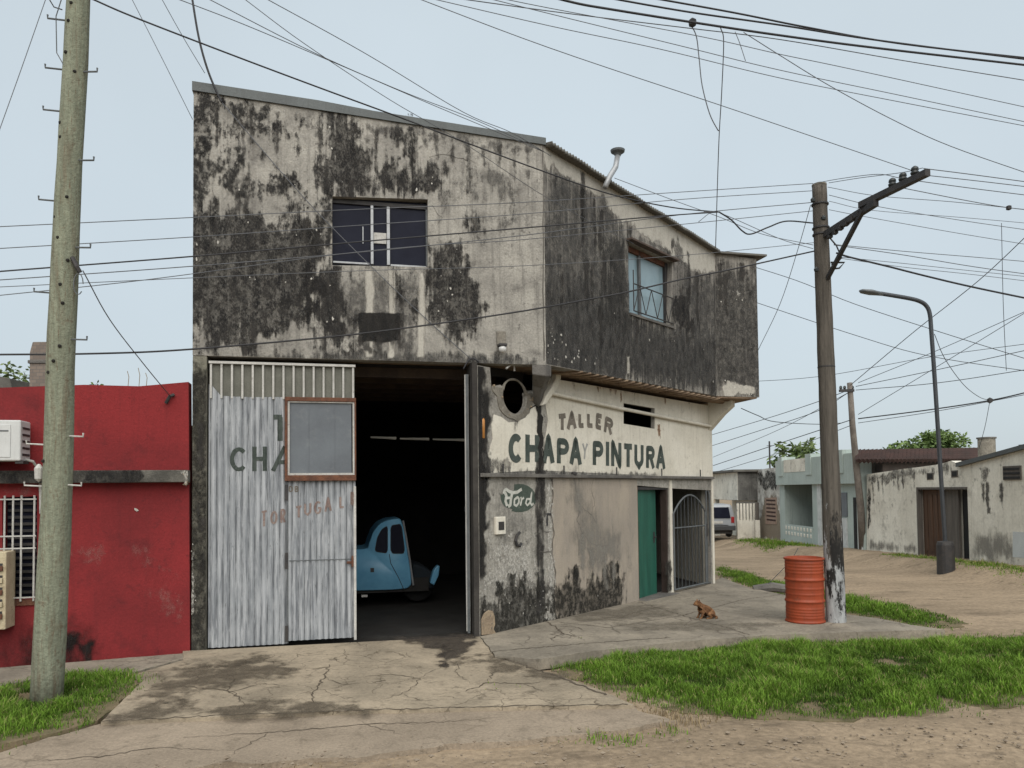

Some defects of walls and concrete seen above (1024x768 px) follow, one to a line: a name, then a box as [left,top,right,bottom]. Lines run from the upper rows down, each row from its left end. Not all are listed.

leakage [193,92,533,361]
leakage [576,172,606,345]
leakage [672,252,702,348]
flaking render [484,485,556,621]
leakage [480,398,627,636]
leakage [870,540,915,552]
leakage [869,459,951,500]
leakage [980,468,1003,514]
leakage [977,537,1012,562]
crack [30,658,628,761]